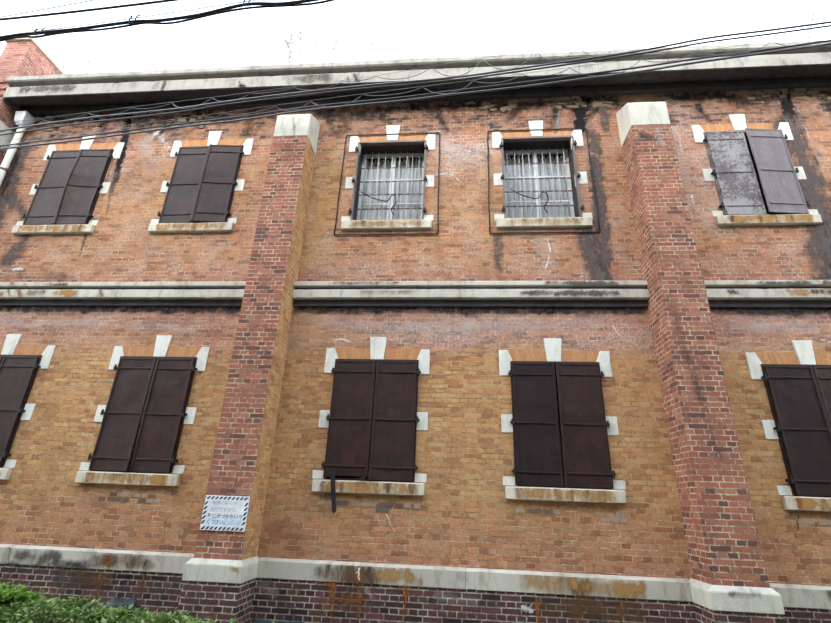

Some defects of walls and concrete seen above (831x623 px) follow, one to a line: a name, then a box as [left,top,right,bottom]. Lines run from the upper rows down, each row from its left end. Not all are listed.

leakage [759,91,831,295]
rust [85,472,168,485]
rust [320,481,417,495]
rust [796,498,831,511]